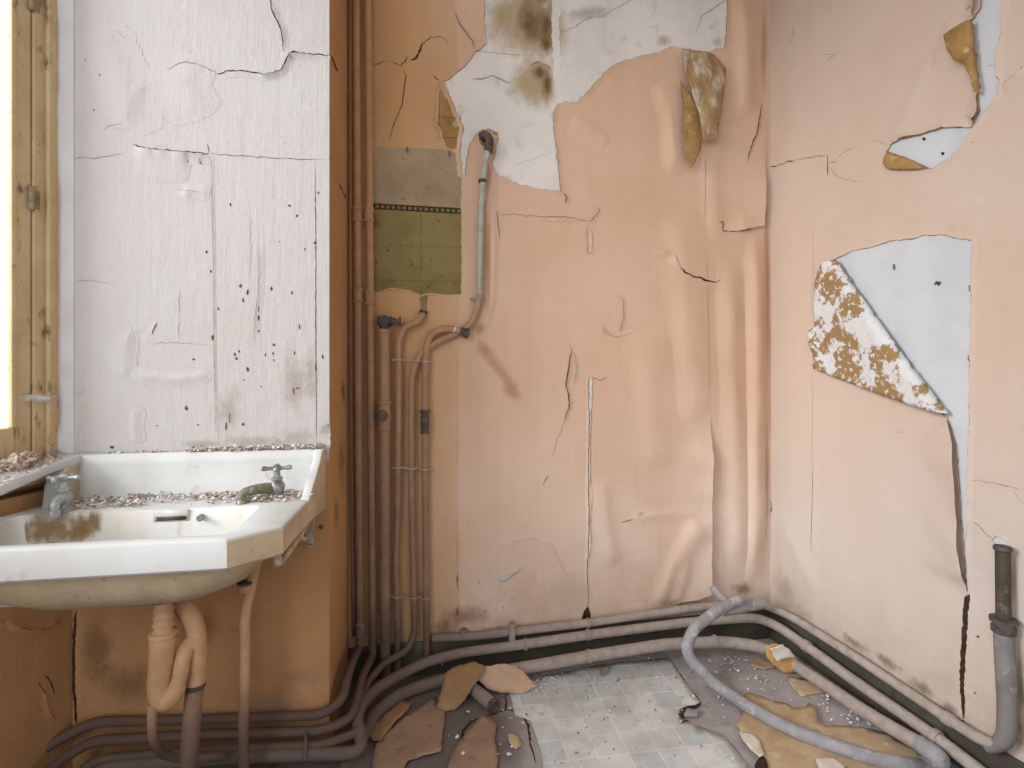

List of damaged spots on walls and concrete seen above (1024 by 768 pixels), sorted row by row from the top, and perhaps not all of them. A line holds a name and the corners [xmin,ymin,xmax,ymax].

crack [170,0,338,81]
crack [373,10,551,143]
water stain [495,0,562,50]
water stain [516,65,551,100]
crack [747,103,857,182]
crack [77,144,321,439]
crack [651,247,720,283]
crack [554,344,606,608]
crack [959,569,983,728]